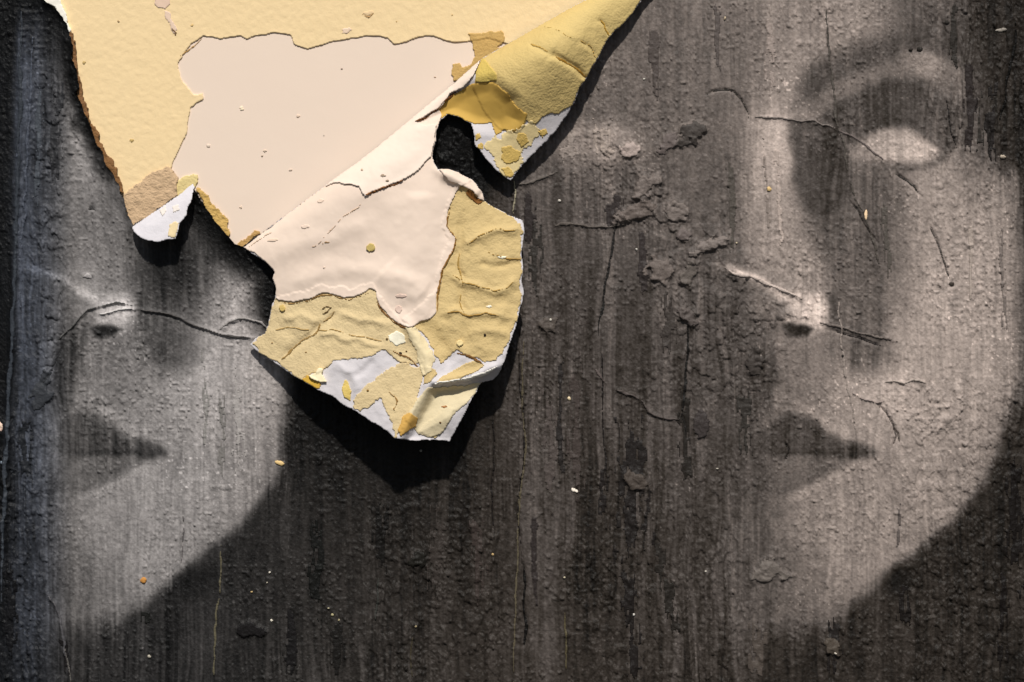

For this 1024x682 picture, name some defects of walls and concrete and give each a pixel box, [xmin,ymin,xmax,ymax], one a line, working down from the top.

peeling [171,27,506,246]